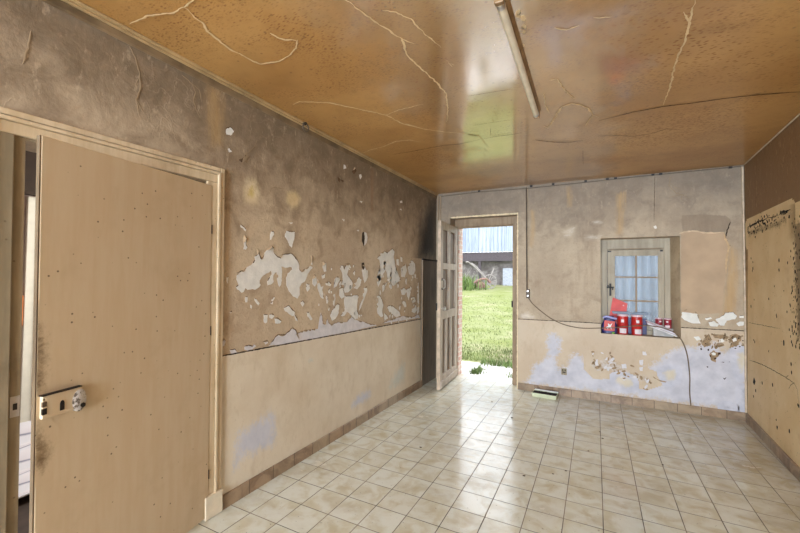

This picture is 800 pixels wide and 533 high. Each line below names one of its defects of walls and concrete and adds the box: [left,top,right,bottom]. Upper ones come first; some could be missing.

crack [130,0,298,64]
crack [293,0,518,154]
crack [599,0,790,136]
peeling [223,222,420,354]
water stain [745,198,800,349]
flaking render [584,349,666,390]